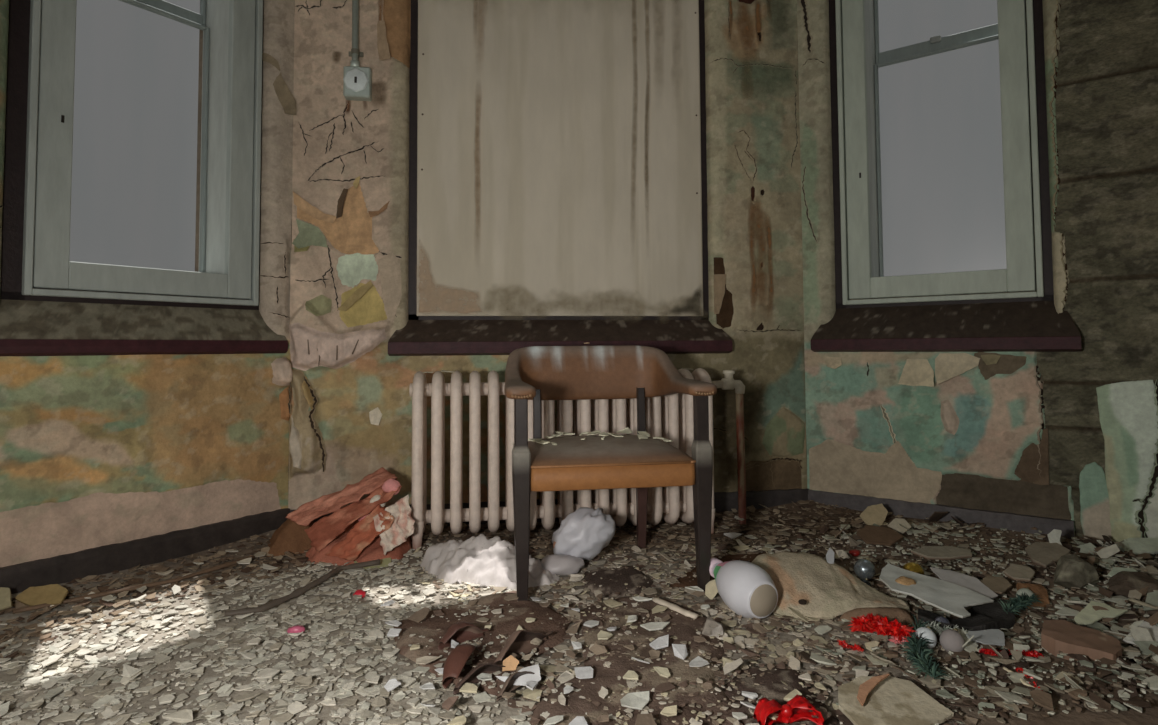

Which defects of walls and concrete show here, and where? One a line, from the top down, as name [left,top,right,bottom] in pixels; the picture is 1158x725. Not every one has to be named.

crack [295,0,347,15]
flaking render [377,0,411,71]
peeling [262,53,296,115]
crack [299,103,386,183]
crack [709,0,826,242]
flaking render [292,176,402,327]
spalling [737,0,1158,537]
crack [288,376,327,472]
crack [1132,379,1158,538]
peeling [0,479,281,568]